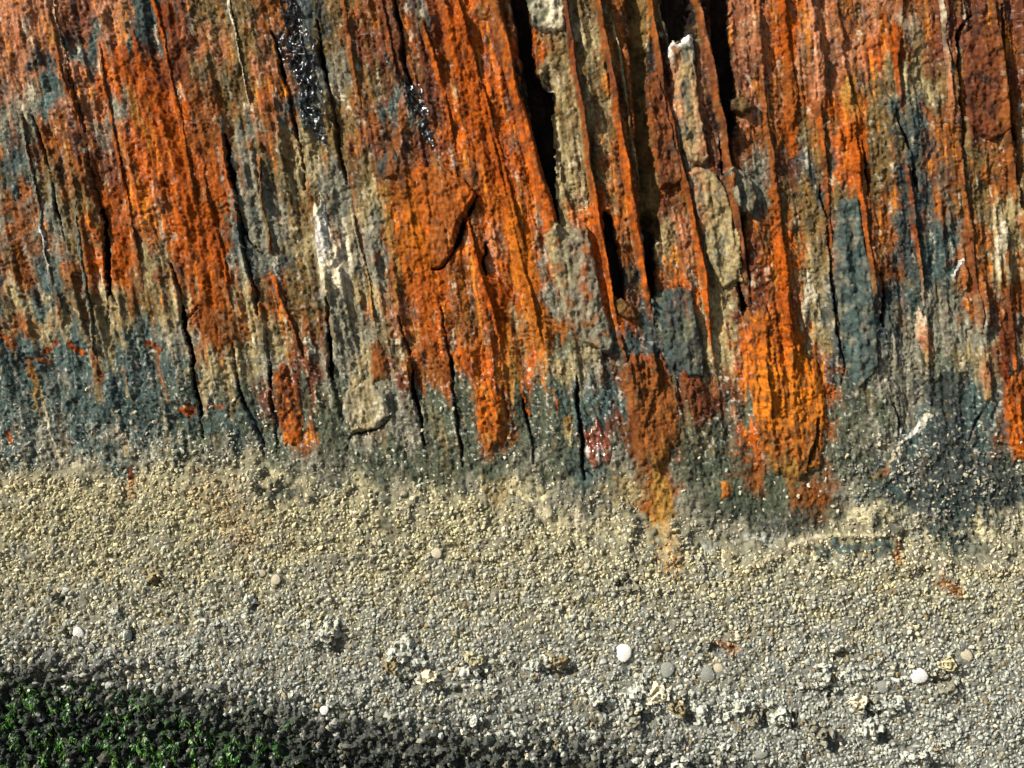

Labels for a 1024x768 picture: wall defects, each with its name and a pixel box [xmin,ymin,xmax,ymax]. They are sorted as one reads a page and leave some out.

corrosion [962,22,1012,141]
corrosion [106,0,251,359]
crack [224,134,237,190]
corrosion [375,0,638,416]
damp [0,363,250,471]
crack [181,305,204,416]
crack [411,368,423,435]
crack [448,358,456,380]
damp [512,376,590,534]
damp [677,402,907,566]
corrosion [830,198,879,388]
damp [871,368,1014,568]